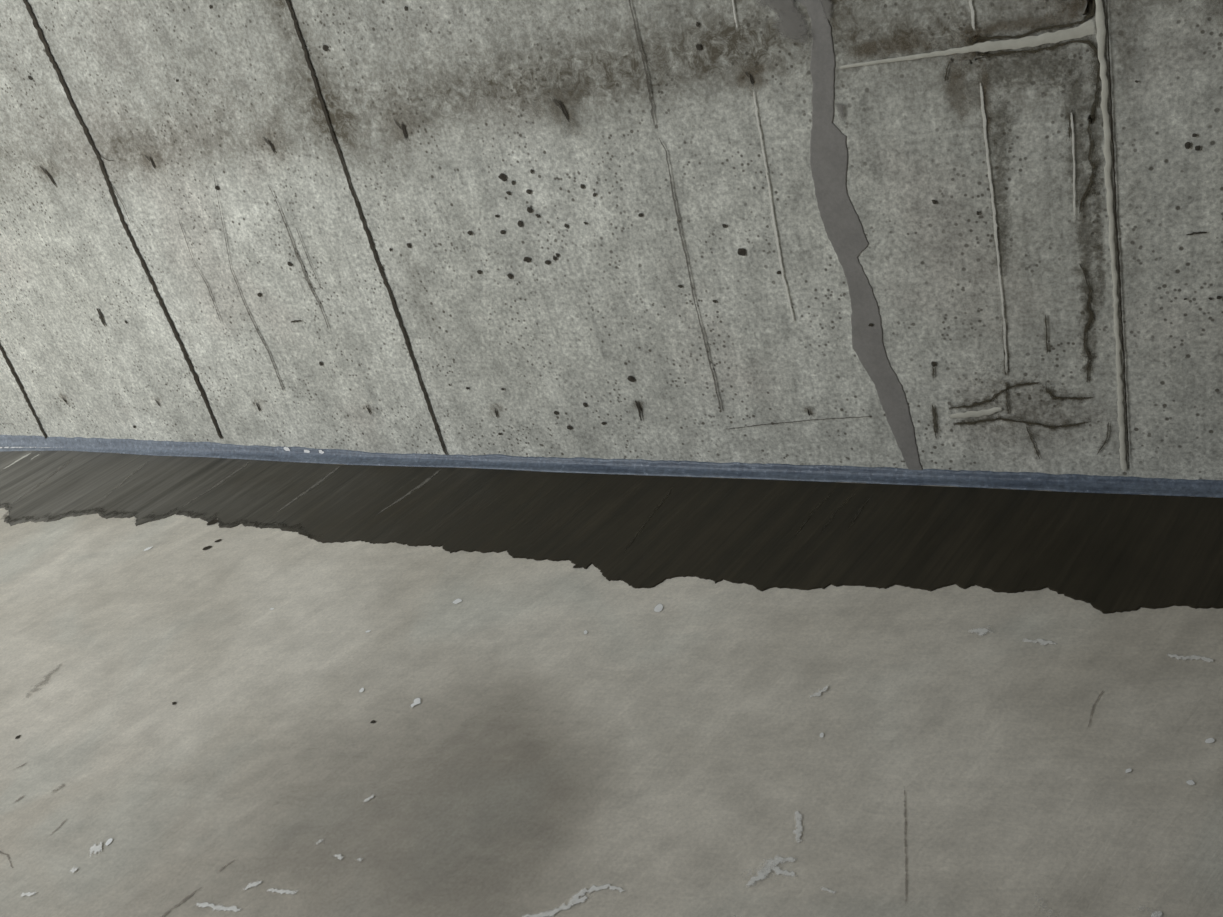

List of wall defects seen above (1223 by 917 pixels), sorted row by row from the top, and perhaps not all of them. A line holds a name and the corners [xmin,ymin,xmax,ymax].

water stain [932,83,1093,459]
water stain [967,0,1100,216]